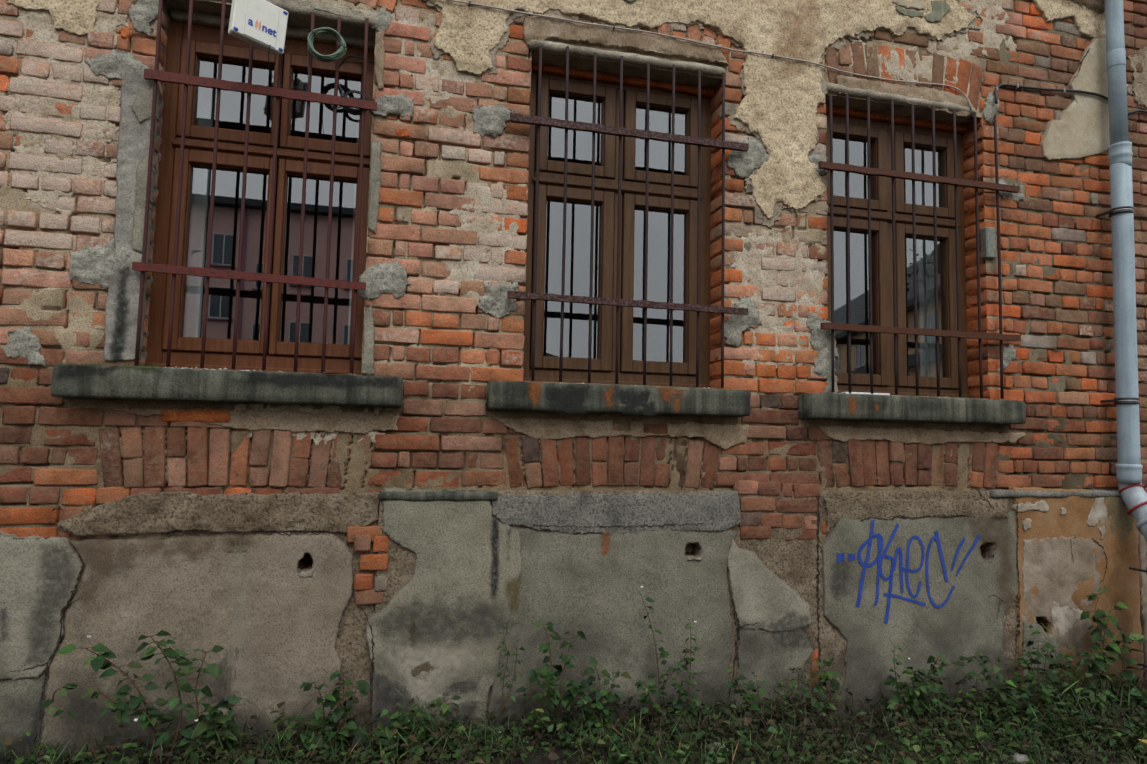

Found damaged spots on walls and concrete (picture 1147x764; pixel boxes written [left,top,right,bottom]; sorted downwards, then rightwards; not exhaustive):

peeling [7,0,99,36]
peeling [423,0,983,230]
peeling [1032,0,1110,162]
peeling [1126,47,1147,108]
leakage [384,518,519,636]
peeling [0,487,1144,764]
leakage [375,646,480,726]